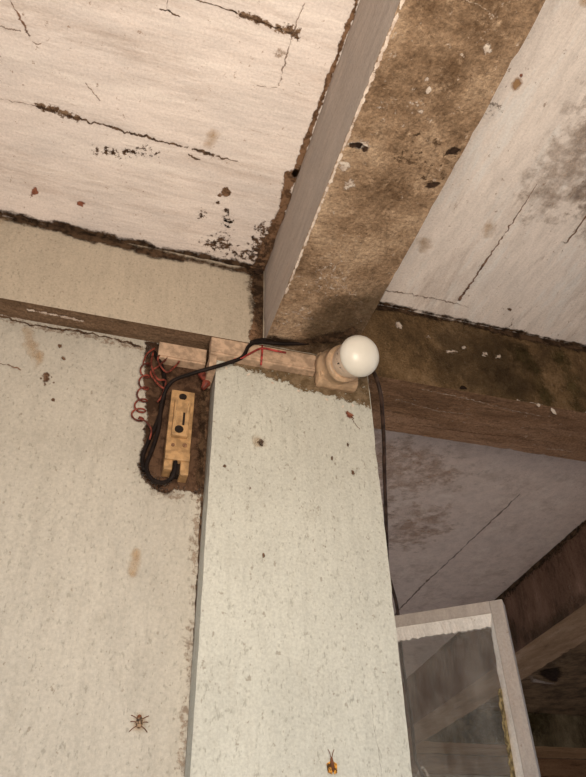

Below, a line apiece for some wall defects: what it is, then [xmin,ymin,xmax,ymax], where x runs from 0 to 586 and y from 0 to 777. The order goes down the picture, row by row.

crack [0,2,41,45]
crack [197,0,305,88]
crack [9,100,238,162]
crack [385,184,537,305]
crack [394,495,519,616]